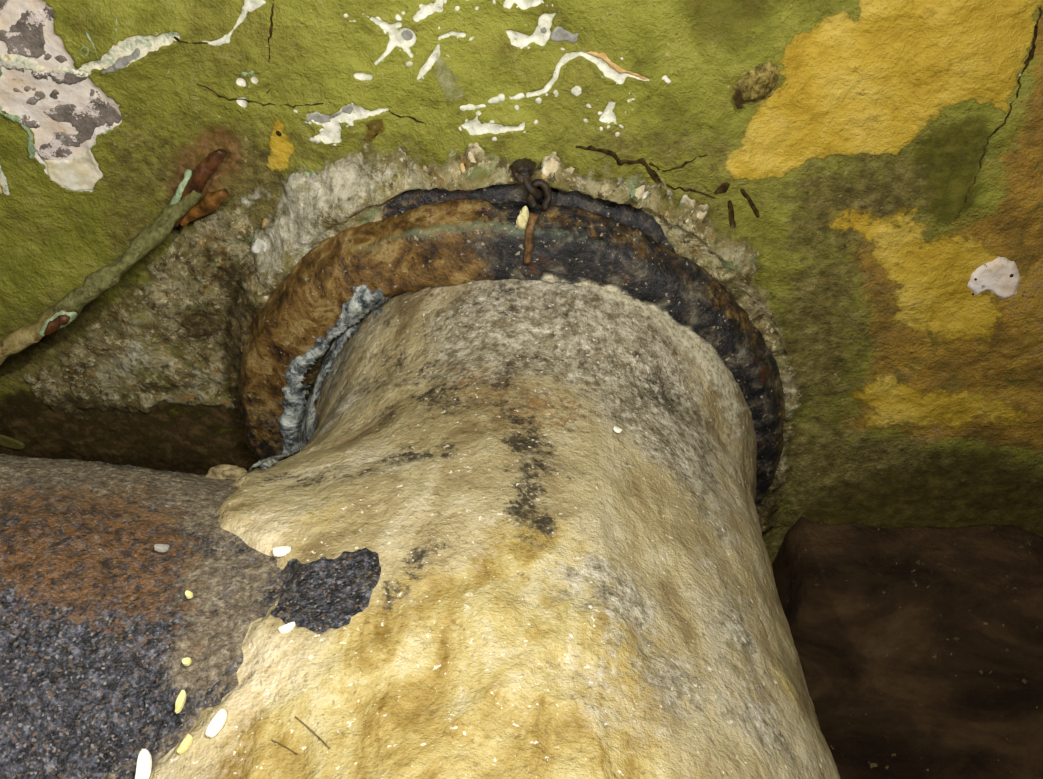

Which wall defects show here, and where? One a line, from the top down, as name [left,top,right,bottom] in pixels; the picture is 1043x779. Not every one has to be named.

peeling [0,0,122,195]
crack [78,0,324,108]
corrosion [170,129,241,195]
peeling [236,70,259,108]
peeling [293,103,389,146]
crack [363,111,426,141]
peeling [343,0,479,81]
peeling [458,0,671,141]
crack [575,145,759,228]
crack [954,0,1043,219]
spalling [967,256,1020,299]
peeling [270,546,381,634]